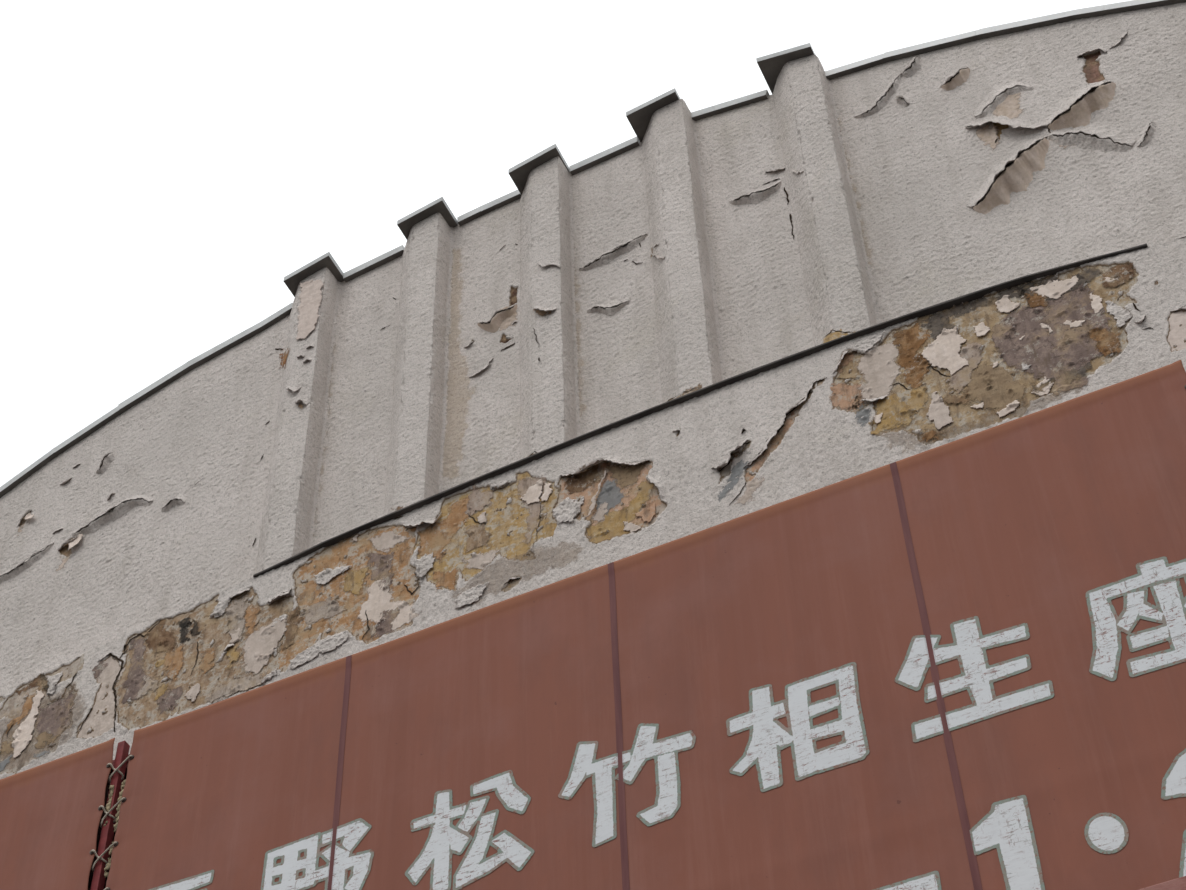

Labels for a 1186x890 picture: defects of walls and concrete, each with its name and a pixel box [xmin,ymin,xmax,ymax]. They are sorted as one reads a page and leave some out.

flaking render [965,47,1137,215]
flaking render [477,288,518,351]
flaking render [533,306,557,343]
peeling [1167,308,1186,351]
peeling [711,262,1139,506]
flaking render [96,452,116,474]
peeling [0,457,668,774]